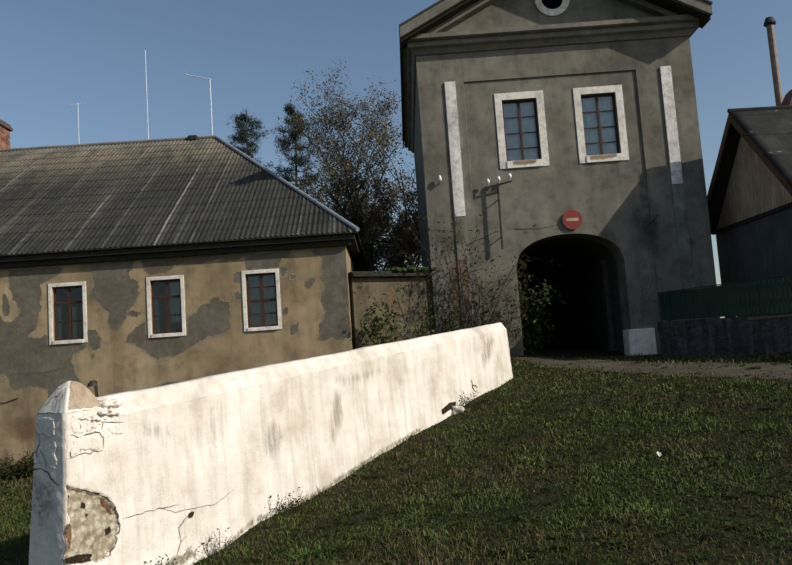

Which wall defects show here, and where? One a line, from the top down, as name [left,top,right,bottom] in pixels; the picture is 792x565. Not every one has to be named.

peeling [90,251,297,362]
peeling [305,248,351,341]
peeling [0,267,125,457]
peeling [34,417,58,470]
crack [34,384,116,486]
flaking render [63,486,121,565]
crack [122,492,230,555]